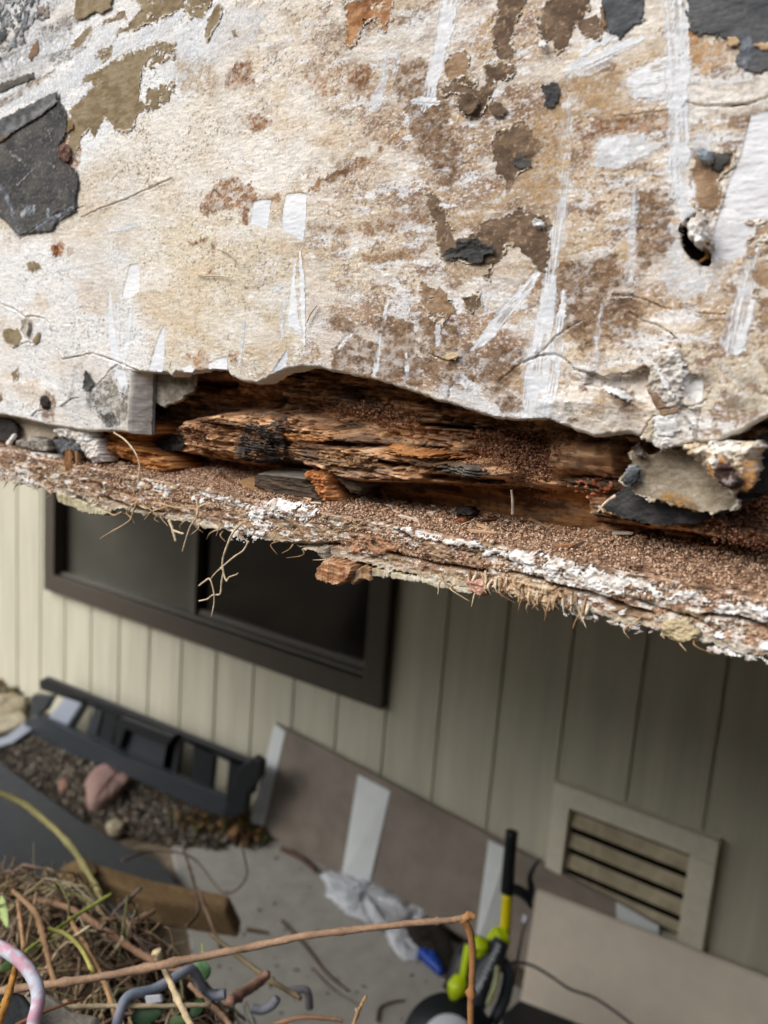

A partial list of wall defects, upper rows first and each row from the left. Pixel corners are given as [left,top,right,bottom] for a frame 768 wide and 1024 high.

spalling [470,99,573,418]
spalling [209,356,228,369]
spalling [590,363,656,408]
spalling [684,375,704,410]
peeling [149,480,171,496]
peeling [191,477,319,543]